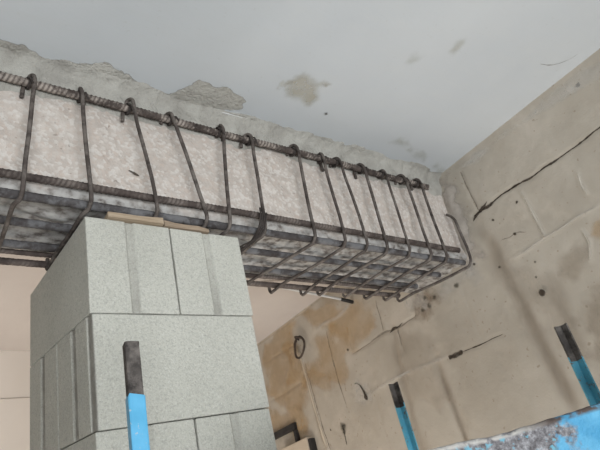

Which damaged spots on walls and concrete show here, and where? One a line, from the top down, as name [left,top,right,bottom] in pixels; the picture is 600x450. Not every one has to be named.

flaking render [0,39,42,58]
flaking render [72,62,136,82]
flaking render [168,80,246,118]
crack [473,127,600,221]
crack [448,335,501,359]